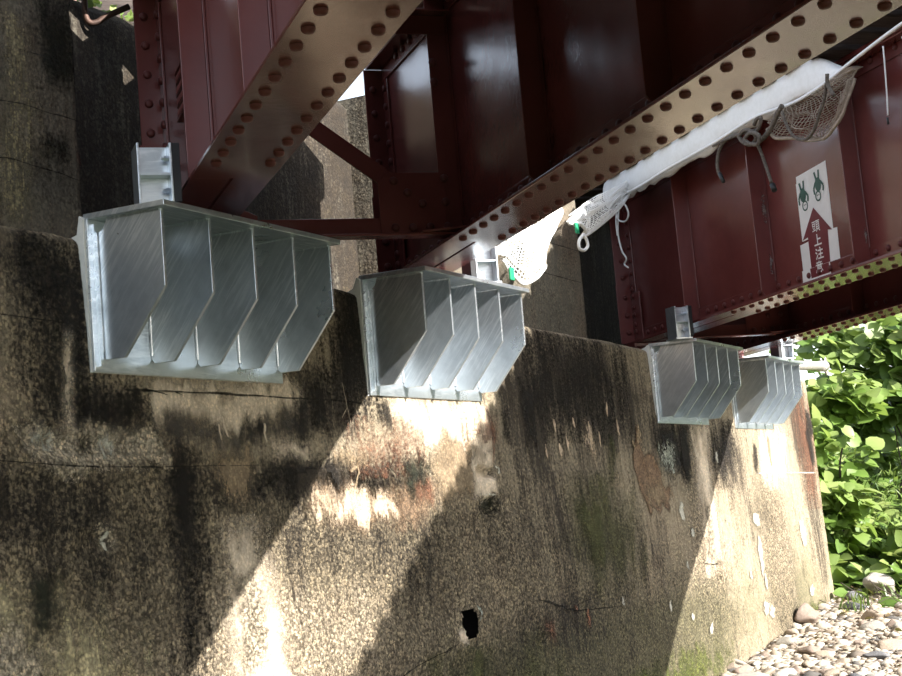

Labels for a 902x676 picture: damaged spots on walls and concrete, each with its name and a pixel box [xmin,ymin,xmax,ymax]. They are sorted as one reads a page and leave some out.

damp [0,4,392,676]
crack [125,383,365,423]
damp [517,327,631,459]
damp [502,406,512,444]
crack [0,460,254,468]
damp [405,459,430,497]
crack [404,643,459,676]